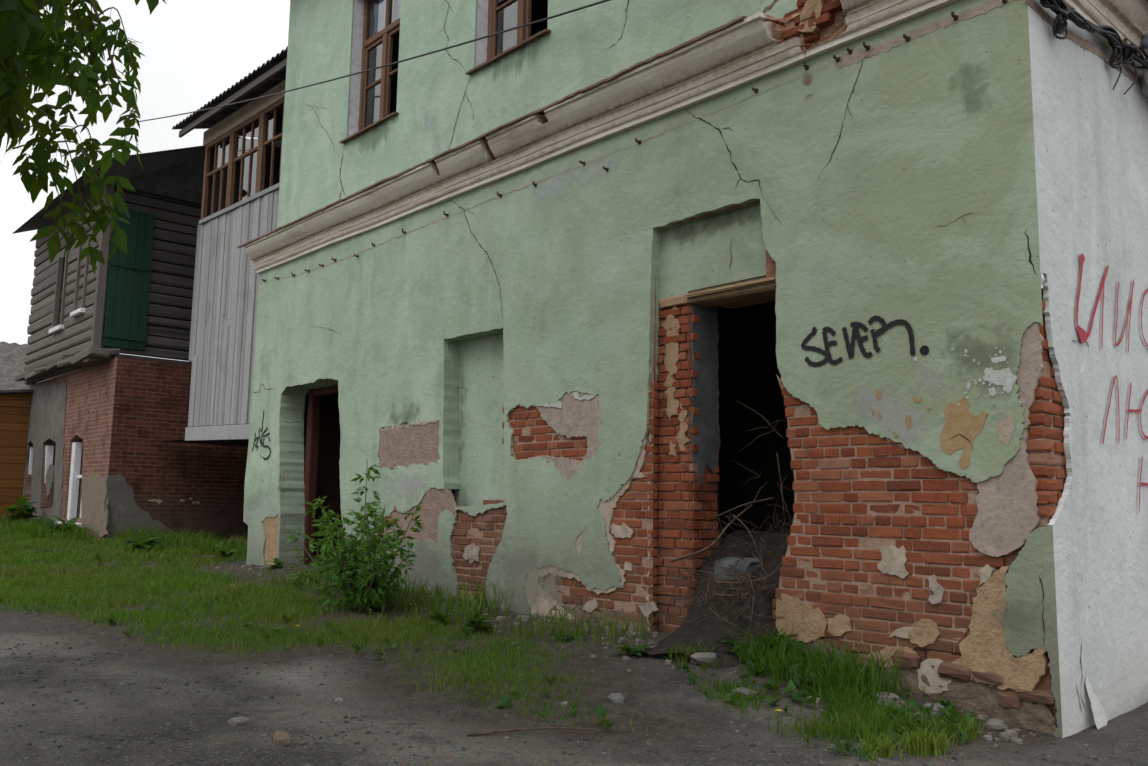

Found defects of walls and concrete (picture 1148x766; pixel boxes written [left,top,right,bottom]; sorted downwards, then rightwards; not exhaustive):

crack [438,0,474,145]
crack [687,110,782,226]
crack [815,49,873,184]
crack [450,200,503,325]
flaking render [78,473,109,537]
flaking render [379,419,440,469]
flaking render [374,488,507,605]
flaking render [502,391,601,481]
flaking render [525,332,659,631]
flaking render [772,273,1067,735]